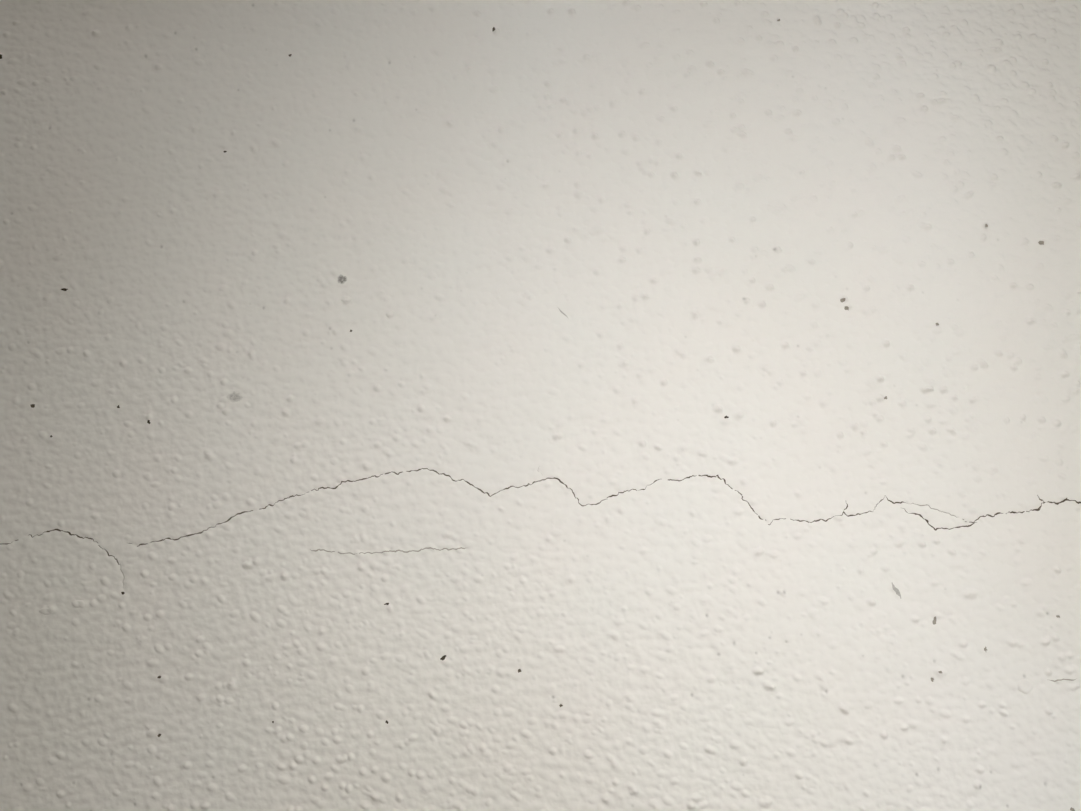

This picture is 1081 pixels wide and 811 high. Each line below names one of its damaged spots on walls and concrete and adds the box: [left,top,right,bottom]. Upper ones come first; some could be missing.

crack [5,467,1081,589]